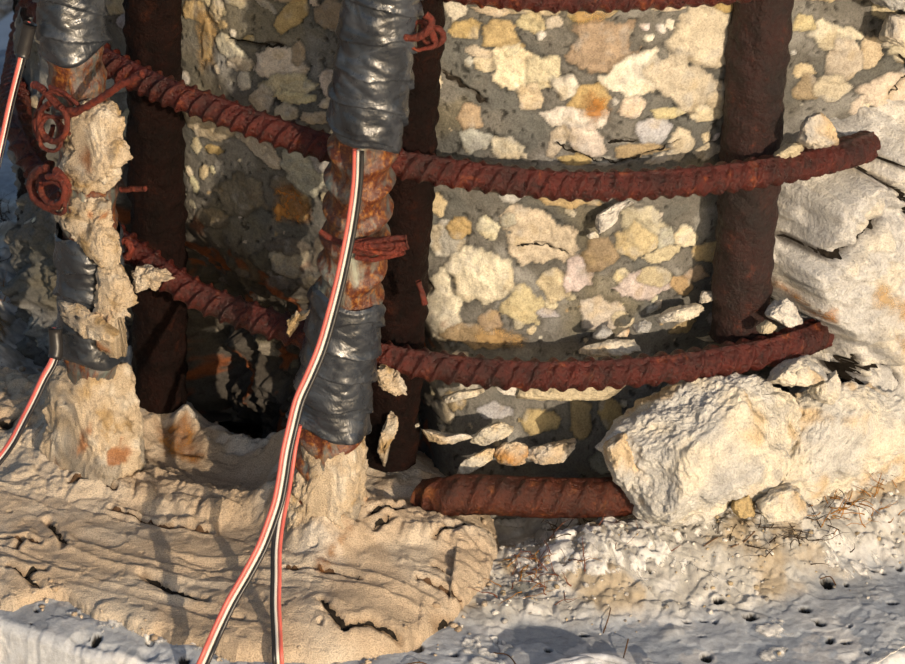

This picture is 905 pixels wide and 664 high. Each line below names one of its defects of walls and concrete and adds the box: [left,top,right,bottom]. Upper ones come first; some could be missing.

spalling [181,0,342,134]
spalling [435,1,733,172]
corrosion [587,98,605,117]
spalling [780,0,905,147]
spalling [182,111,329,316]
spalling [424,185,720,361]
spalling [192,311,301,439]
spalling [415,379,668,478]
spalling [742,365,791,392]